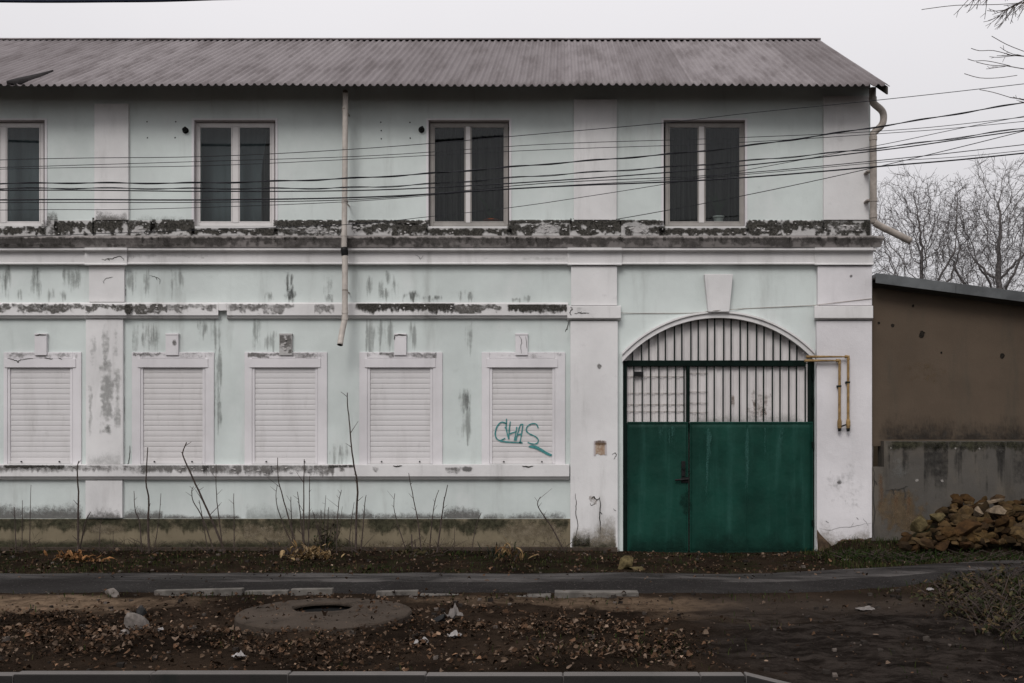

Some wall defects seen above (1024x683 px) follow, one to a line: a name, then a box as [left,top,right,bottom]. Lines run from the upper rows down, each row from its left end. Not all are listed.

peeling [0,220,872,236]
leakage [230,275,293,314]
spalling [594,440,607,456]
leakage [888,430,1024,476]
leakage [0,506,616,547]
crack [575,495,616,539]